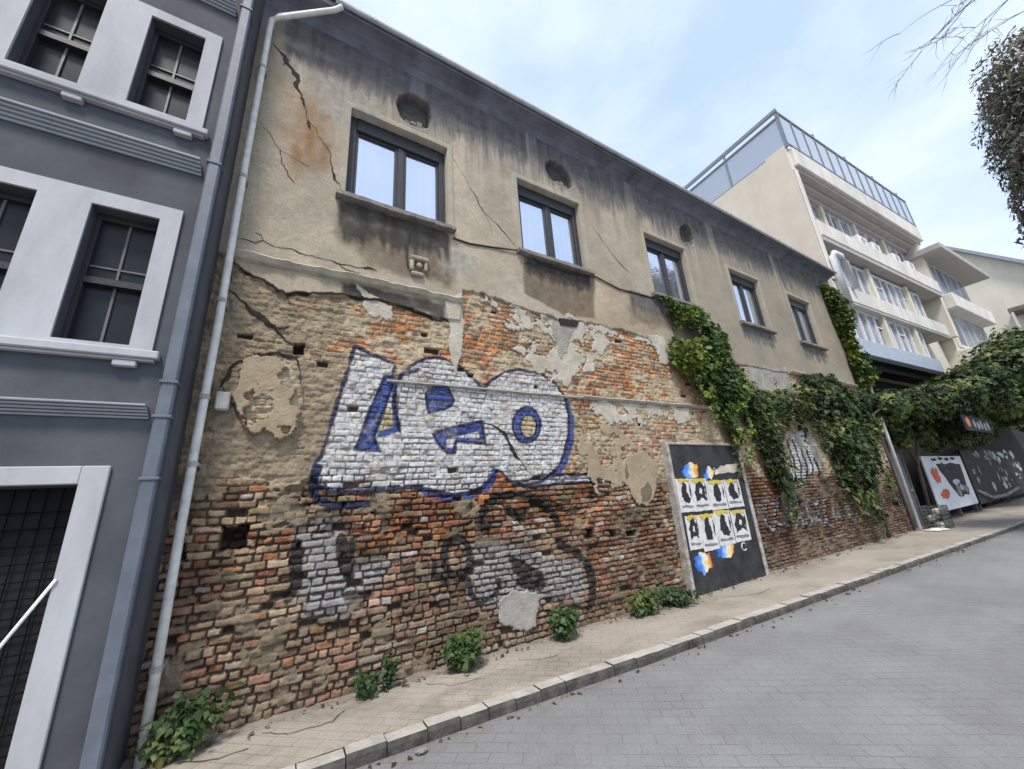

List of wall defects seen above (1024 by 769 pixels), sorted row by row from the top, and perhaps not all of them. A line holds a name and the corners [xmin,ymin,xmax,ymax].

damp [290,21,409,105]
crack [263,43,340,185]
crack [219,232,450,419]
peeling [355,284,393,320]
peeling [445,292,465,374]
peeling [484,294,671,388]
peeling [577,398,690,500]